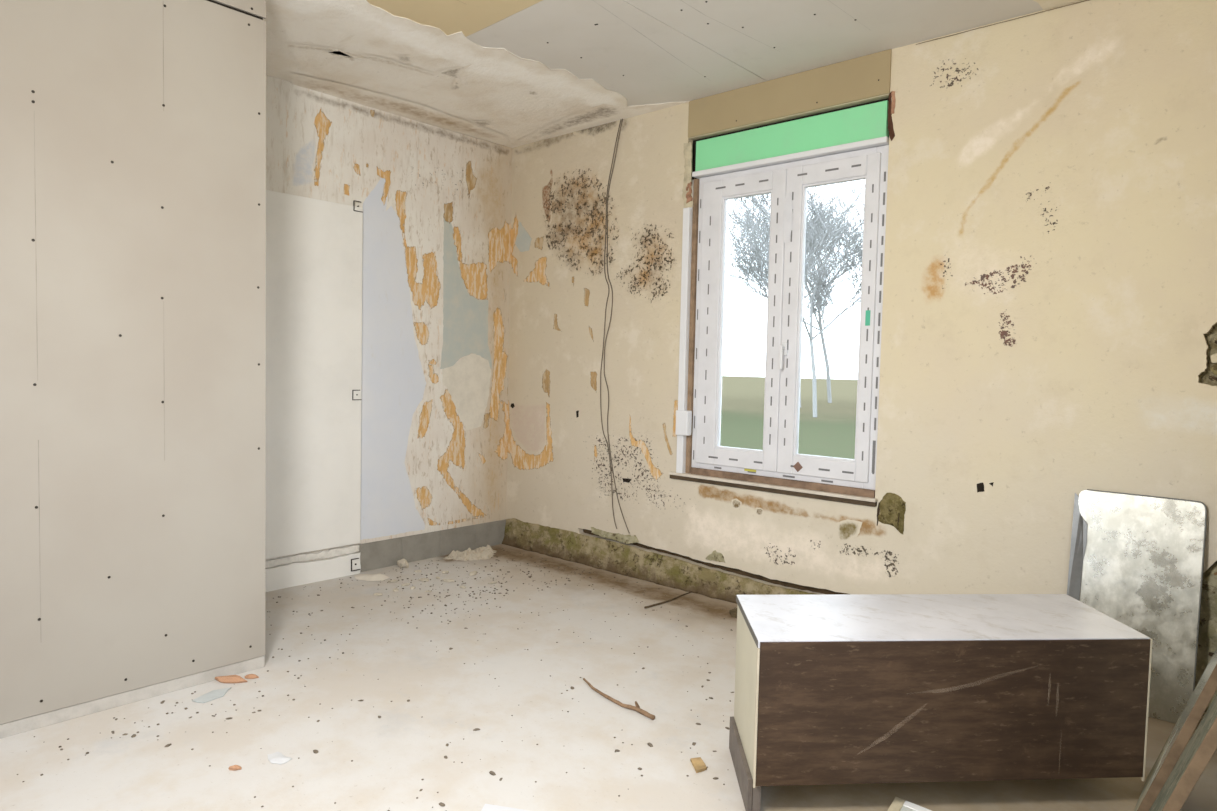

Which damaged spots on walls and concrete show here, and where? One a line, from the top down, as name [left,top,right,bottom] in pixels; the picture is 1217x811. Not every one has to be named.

peeling [263,0,689,148]
peeling [344,164,369,196]
peeling [466,161,477,195]
damp [931,28,1130,358]
flaking render [360,178,426,540]
flaking render [440,219,492,430]
damp [289,72,682,526]
rust [917,249,950,310]
flaking render [1199,324,1217,386]
damp [428,544,737,627]
damp [587,400,905,591]
flaking render [877,493,906,535]